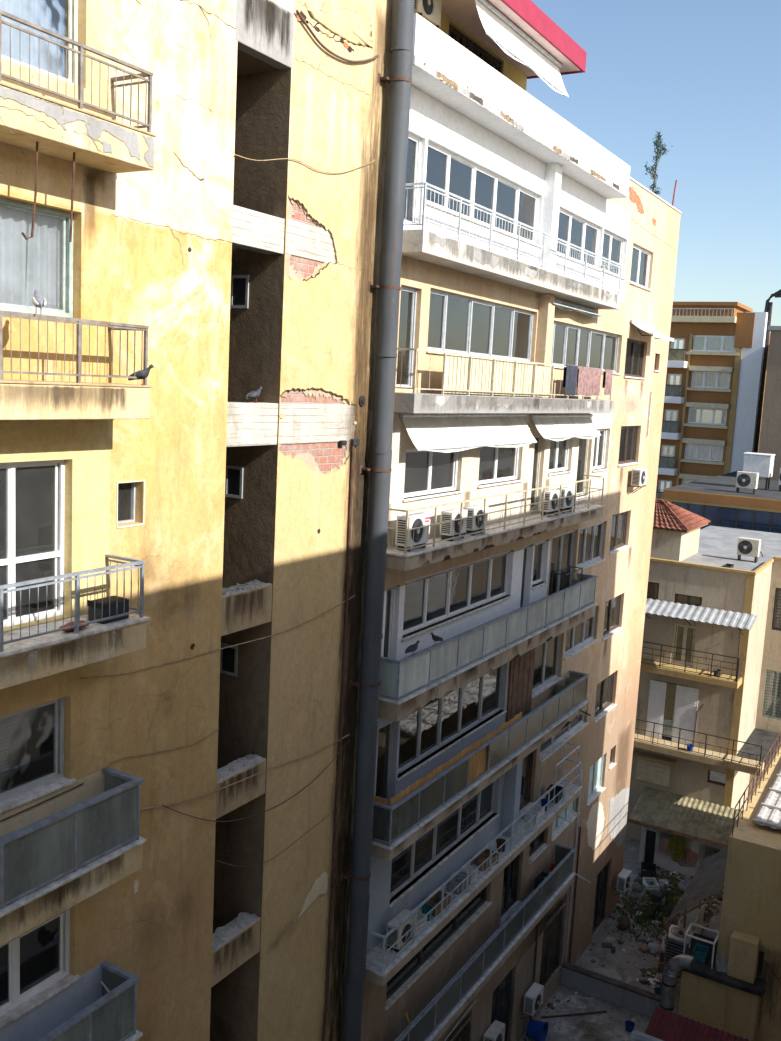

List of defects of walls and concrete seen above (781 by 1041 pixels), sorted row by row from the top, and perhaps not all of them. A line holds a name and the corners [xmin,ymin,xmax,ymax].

crack [173,0,236,57]
peeling [0,85,155,168]
spalling [418,60,657,226]
crack [112,214,232,259]
spalling [285,197,337,281]
spalling [279,387,358,475]